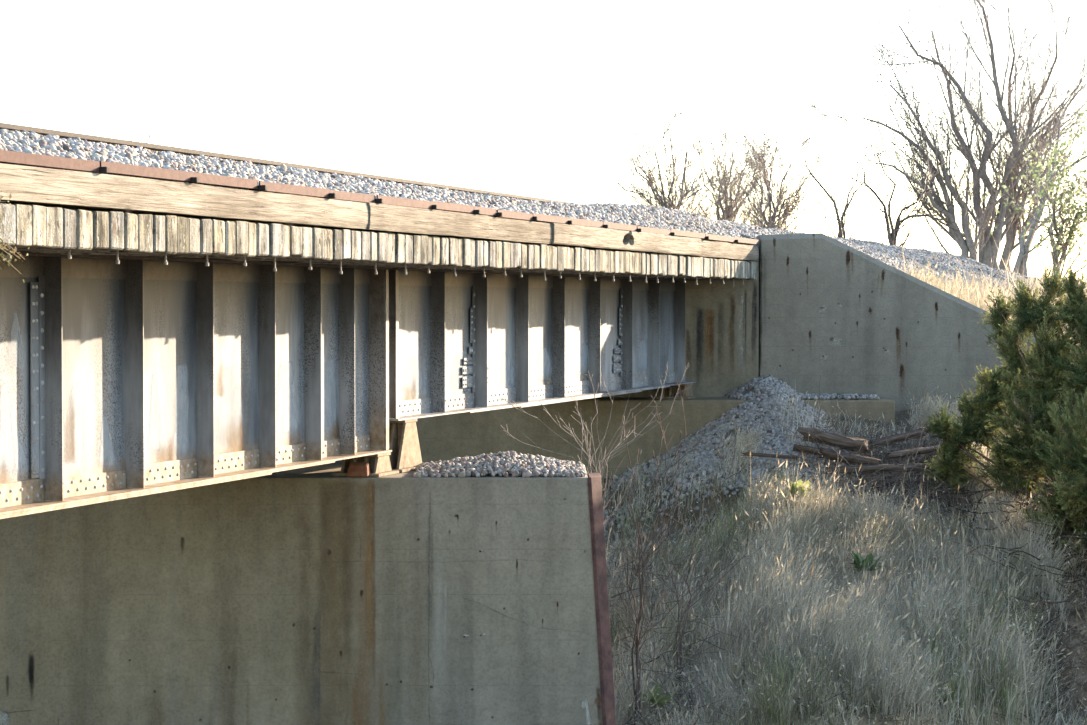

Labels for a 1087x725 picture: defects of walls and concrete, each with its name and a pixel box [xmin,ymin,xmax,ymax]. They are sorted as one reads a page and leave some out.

peeling [0,386,25,466]
peeling [66,382,115,462]
peeling [174,366,187,445]
peeling [276,363,298,432]